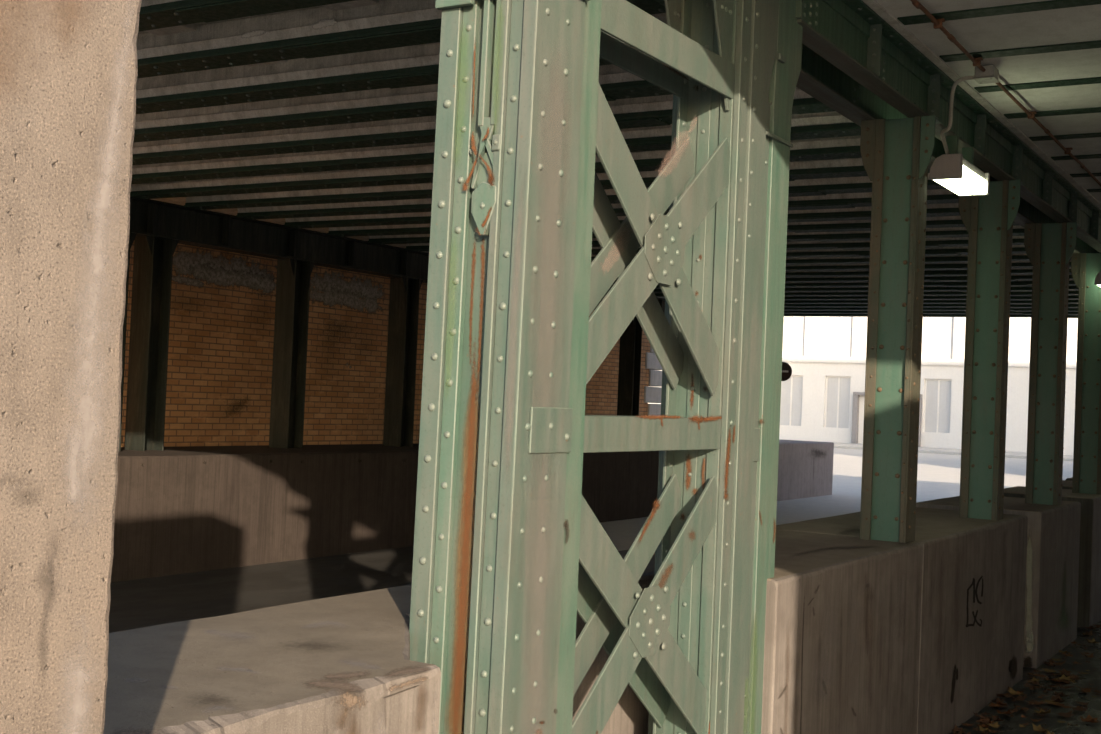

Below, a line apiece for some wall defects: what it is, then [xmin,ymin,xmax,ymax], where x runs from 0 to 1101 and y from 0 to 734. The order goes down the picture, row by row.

rust [463,127,494,191]
rust [637,374,722,430]
rust [453,207,492,734]
rust [685,454,706,495]
rust [724,426,736,499]
spalling [385,666,431,691]